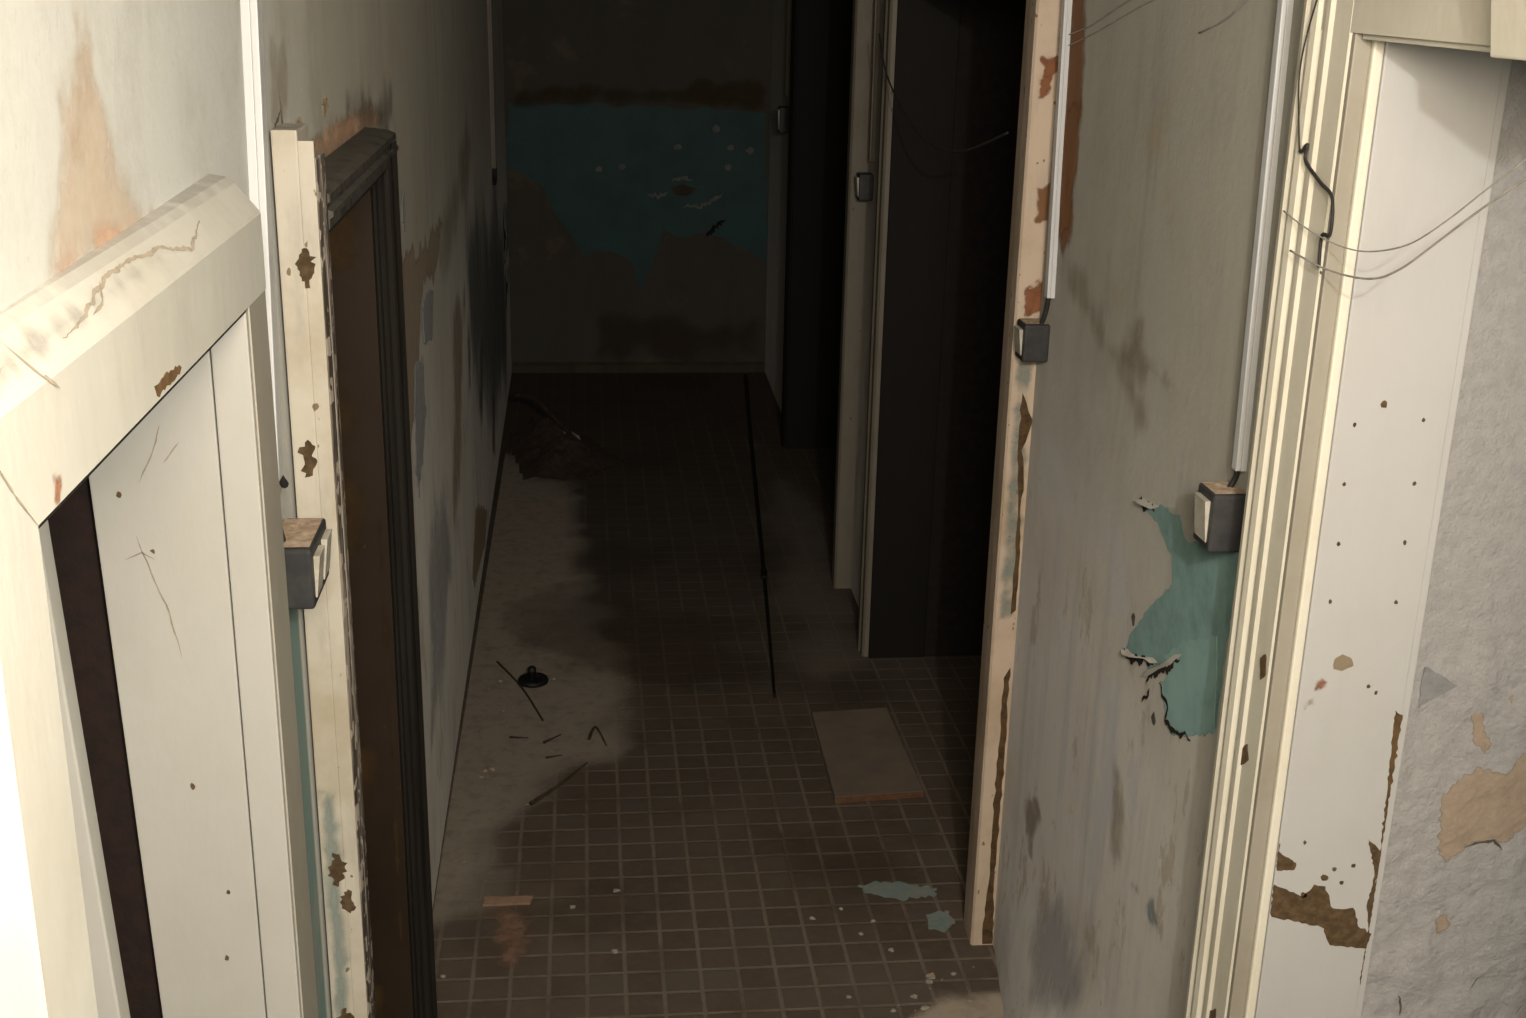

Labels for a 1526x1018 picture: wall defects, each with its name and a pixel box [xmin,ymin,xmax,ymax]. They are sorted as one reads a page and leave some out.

damp [58,53,137,261]
crack [0,220,200,388]
spalling [401,191,442,504]
crack [0,471,39,526]
spalling [472,503,487,588]
peeling [1121,496,1239,741]
spalling [1270,667,1457,985]
peeling [1437,712,1526,862]